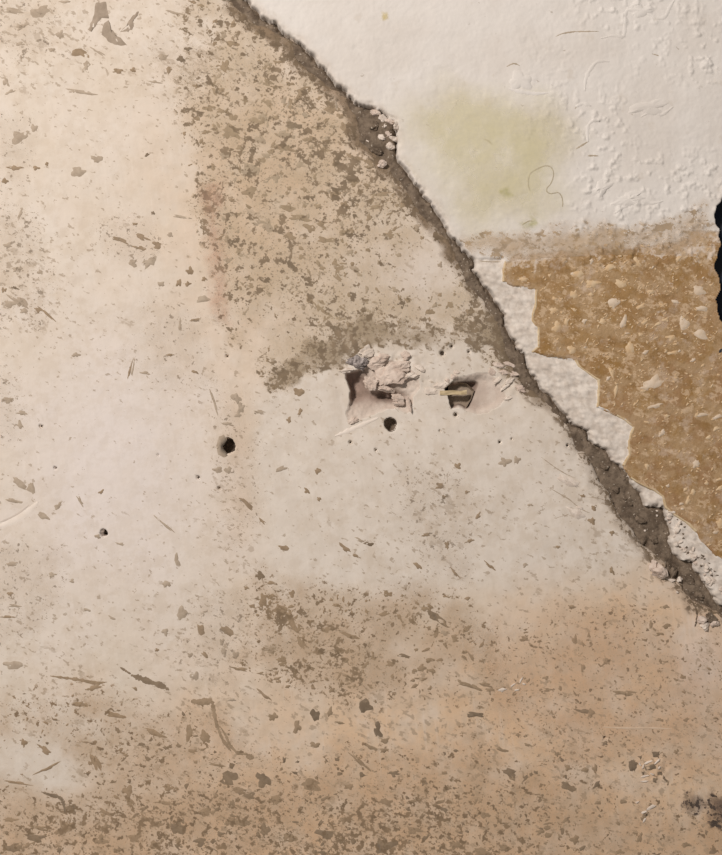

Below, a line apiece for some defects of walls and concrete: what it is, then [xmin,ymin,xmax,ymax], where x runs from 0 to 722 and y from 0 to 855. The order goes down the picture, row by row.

water stain [148,0,512,396]
water stain [100,216,173,269]
water stain [209,389,264,437]
spalling [339,344,525,424]
peeling [502,230,722,559]